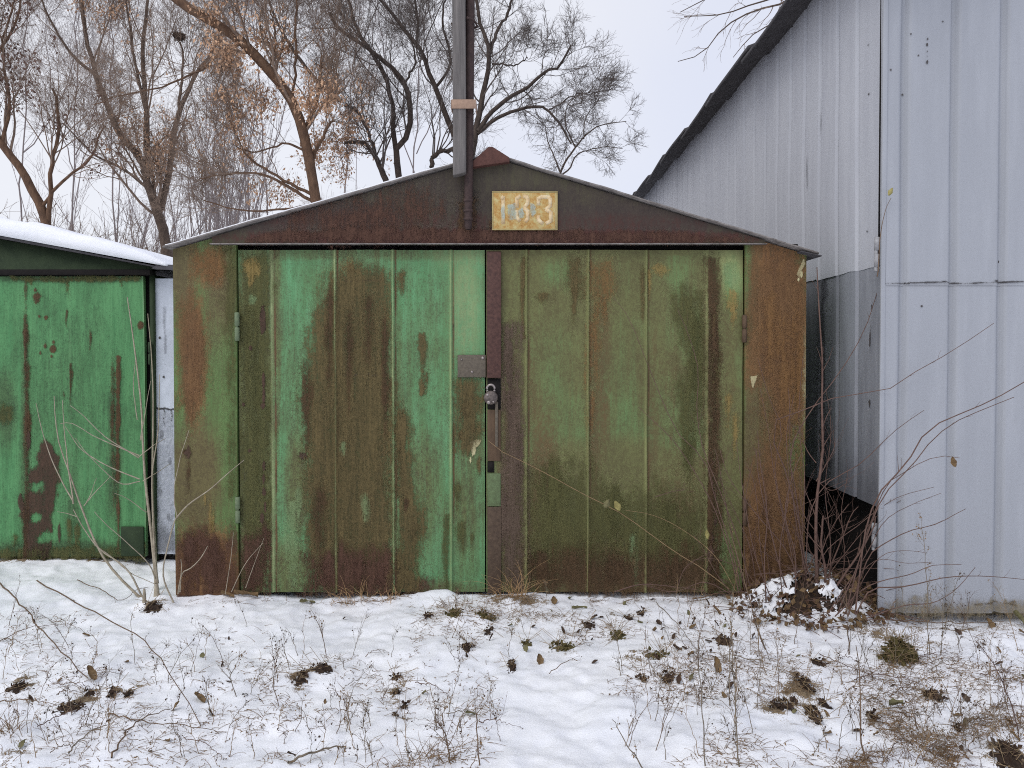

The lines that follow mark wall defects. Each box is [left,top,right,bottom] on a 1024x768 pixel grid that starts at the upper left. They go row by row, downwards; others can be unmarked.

rust [245,199,747,245]
rust [23,282,56,557]
rust [110,355,121,553]
rust [175,524,279,597]
rust [298,263,434,598]
rust [498,258,737,598]
rust [745,506,801,585]